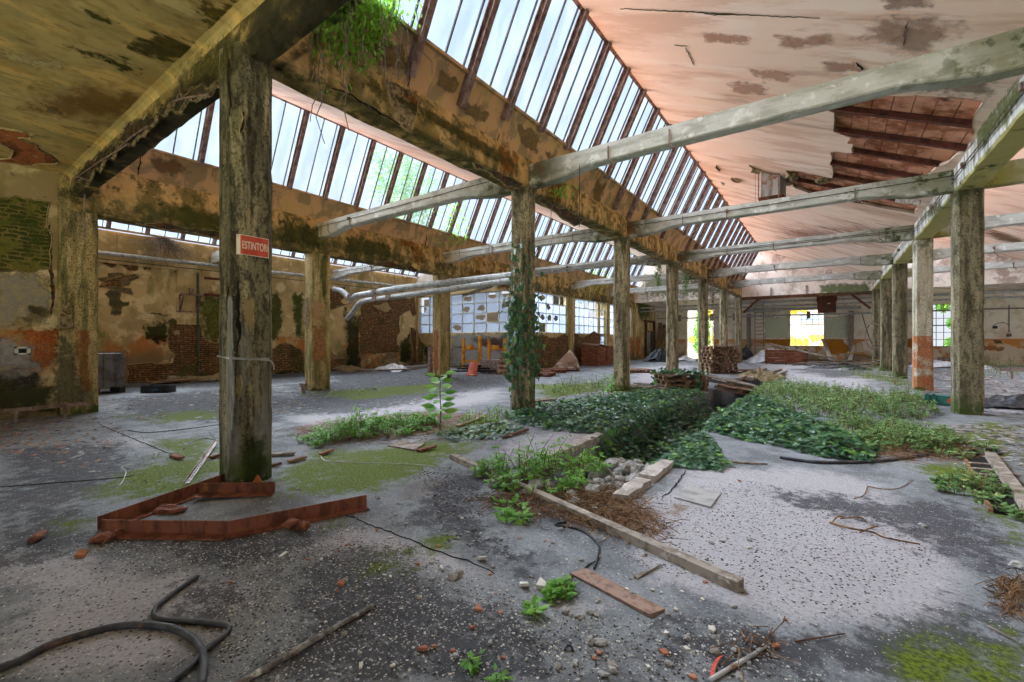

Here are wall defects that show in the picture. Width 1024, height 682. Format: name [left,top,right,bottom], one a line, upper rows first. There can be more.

crack [625,8,820,19]
damp [705,34,748,45]
damp [774,35,828,48]
damp [874,0,943,51]
damp [734,69,789,94]
spalling [0,127,58,167]
spalling [72,80,220,188]
flaking render [0,195,91,391]
flaking render [98,262,151,316]
flaking render [126,315,219,383]
damp [226,297,234,453]
flaking render [355,293,509,370]